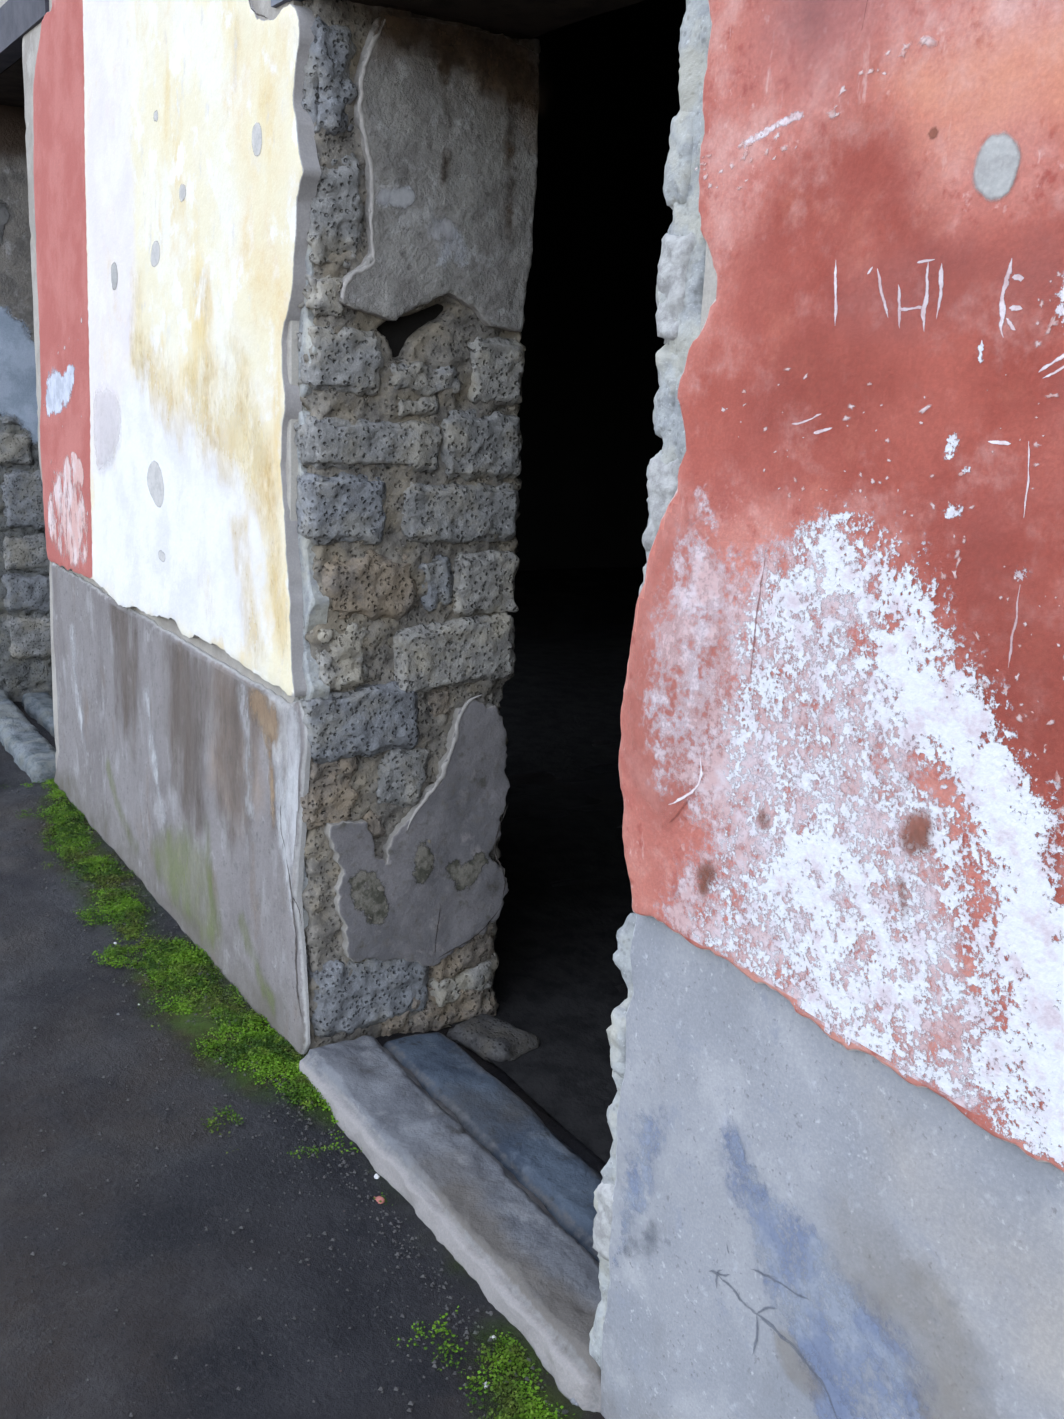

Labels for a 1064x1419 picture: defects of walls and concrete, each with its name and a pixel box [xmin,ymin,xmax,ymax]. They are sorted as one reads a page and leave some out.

spalling [412,839,488,891]
spalling [348,870,389,924]
crack [711,1244,837,1418]